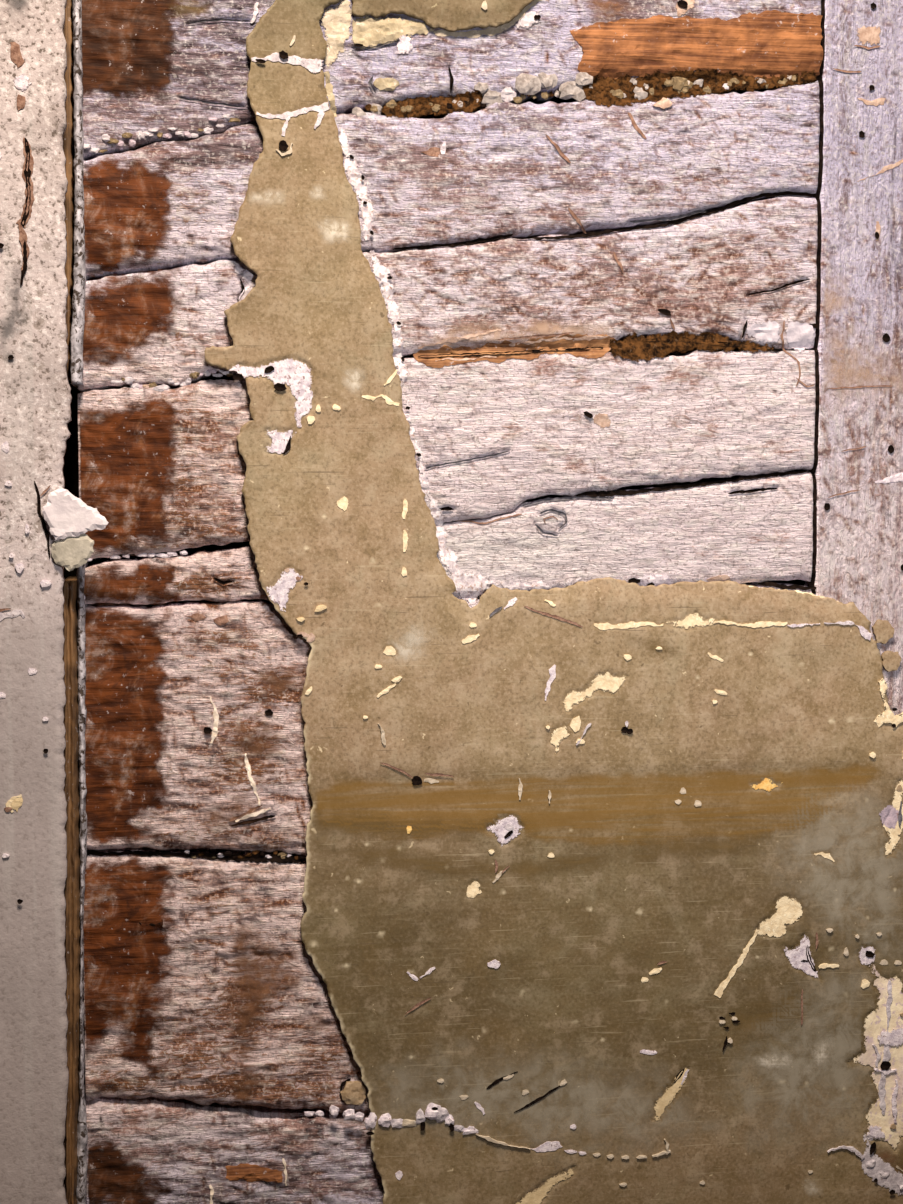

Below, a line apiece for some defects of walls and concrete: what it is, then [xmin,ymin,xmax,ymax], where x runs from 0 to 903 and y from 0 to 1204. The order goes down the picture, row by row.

peeling [82,0,179,100]
peeling [320,0,542,67]
peeling [83,157,176,365]
crack [393,191,815,250]
spalling [229,359,341,455]
peeling [339,128,582,644]
crack [426,451,509,469]
crack [439,470,813,524]
peeling [25,399,180,1075]
peeling [545,672,625,751]
crack [87,850,303,863]
flaking render [714,896,903,1195]